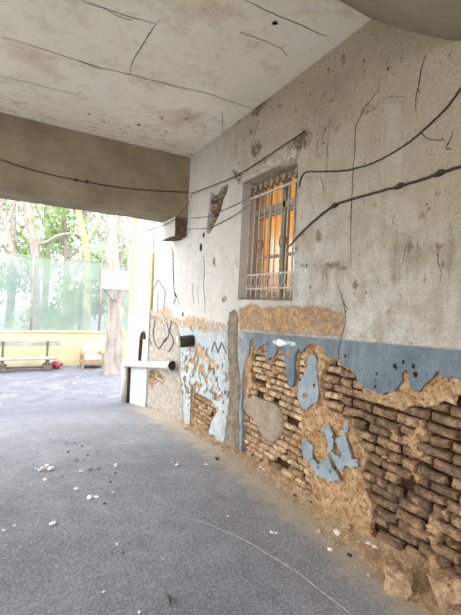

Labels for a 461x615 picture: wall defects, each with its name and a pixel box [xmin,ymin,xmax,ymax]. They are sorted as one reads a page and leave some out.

crack [4,1,250,108]
crack [247,1,326,36]
spalling [209,186,228,230]
flaking render [151,307,227,332]
crack [326,276,356,355]
spalling [149,370,164,387]
spalling [182,347,229,430]
spalling [244,340,461,578]